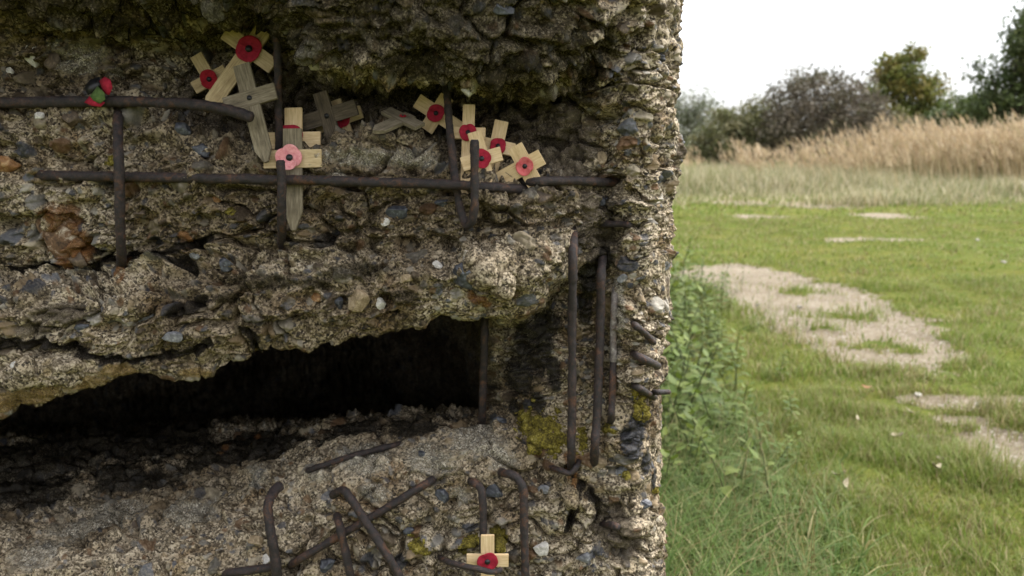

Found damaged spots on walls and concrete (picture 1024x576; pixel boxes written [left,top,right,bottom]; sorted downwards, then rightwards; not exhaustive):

corrosion [0,36,620,283]
spalling [14,301,102,337]
corrosion [549,226,618,487]
corrosion [630,320,661,370]
corrosion [630,383,671,401]
corrosion [303,441,402,473]
corrosion [221,476,437,576]
corrosion [437,477,503,575]
corrosion [497,468,530,576]